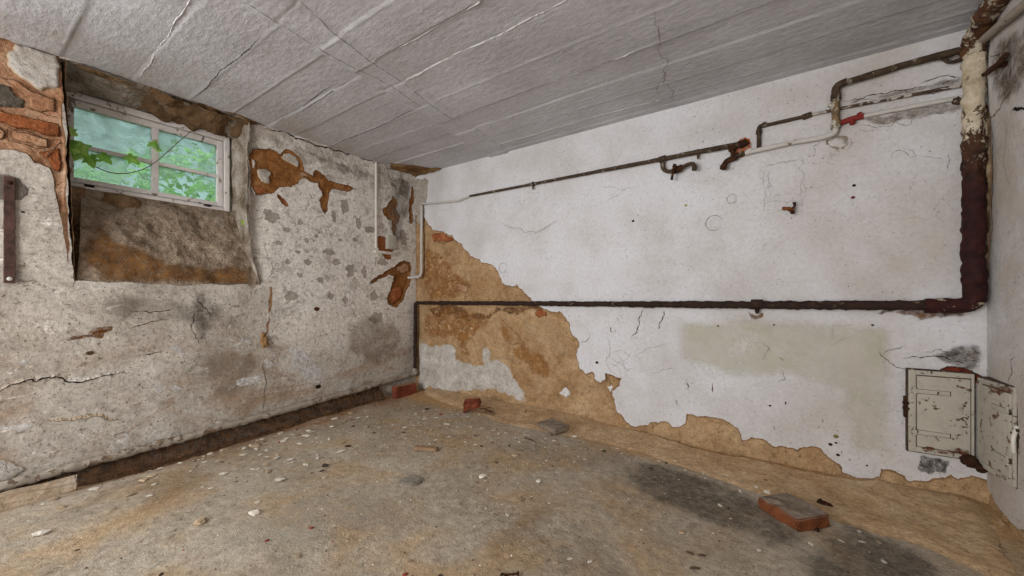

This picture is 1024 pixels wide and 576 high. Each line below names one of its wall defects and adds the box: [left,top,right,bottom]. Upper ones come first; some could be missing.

crack [653,9,674,98]
flaking render [0,38,70,260]
crack [0,351,161,391]
crack [132,299,213,342]
crack [581,308,686,385]
spalling [248,148,1024,542]